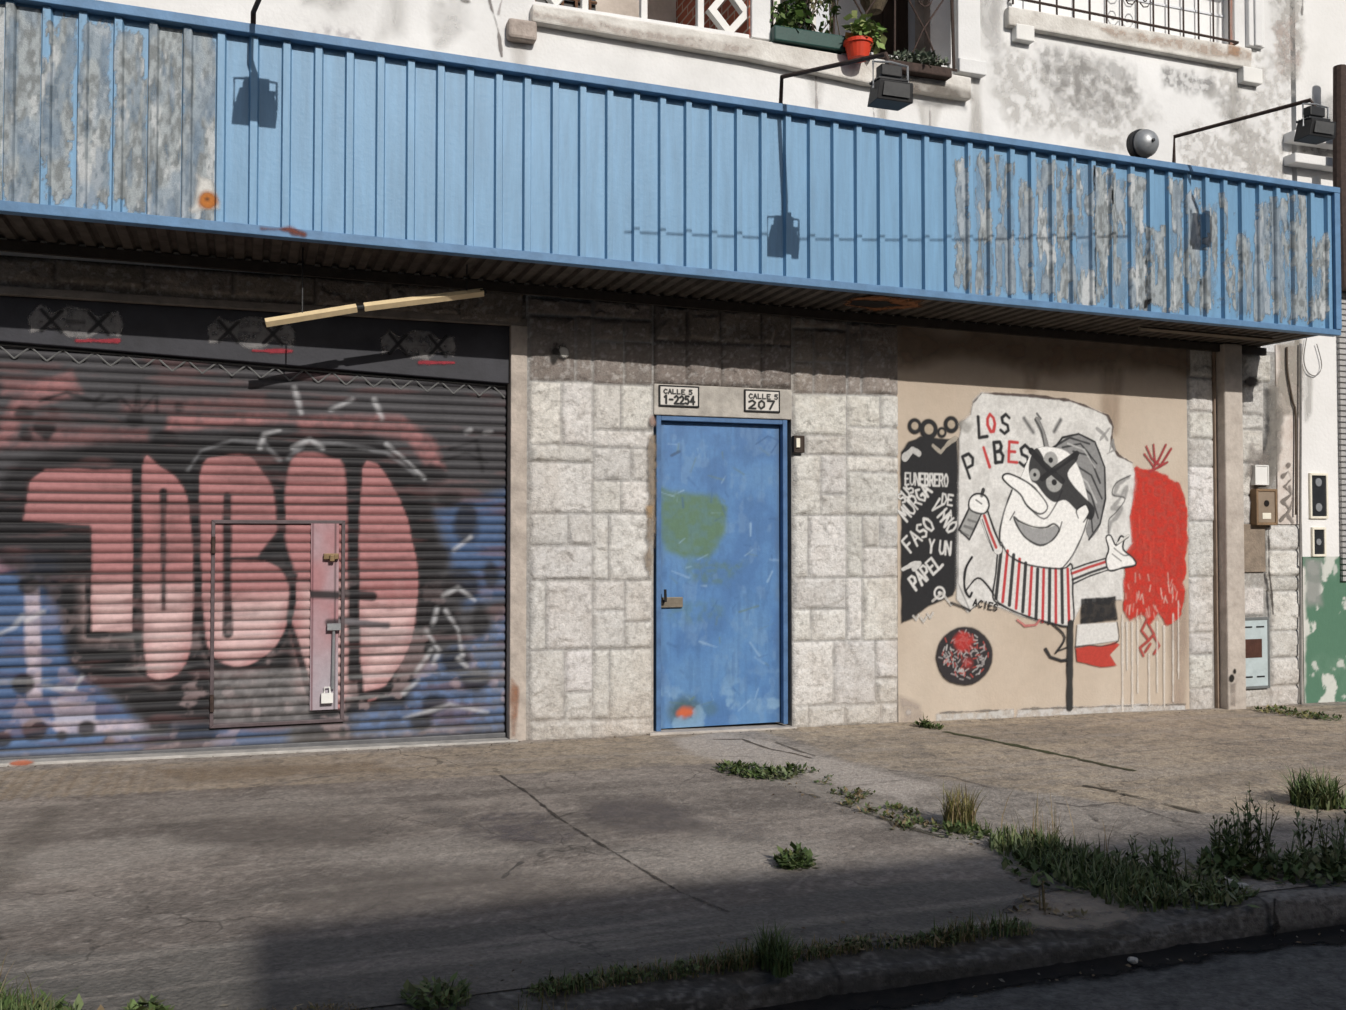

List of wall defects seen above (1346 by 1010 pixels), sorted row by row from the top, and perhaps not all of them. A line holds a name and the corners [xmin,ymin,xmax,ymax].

peeling [0,2,216,221]
damp [1042,49,1132,121]
damp [1164,70,1212,92]
peeling [953,151,1330,325]
peeling [1245,340,1303,524]
crack [500,775,729,912]